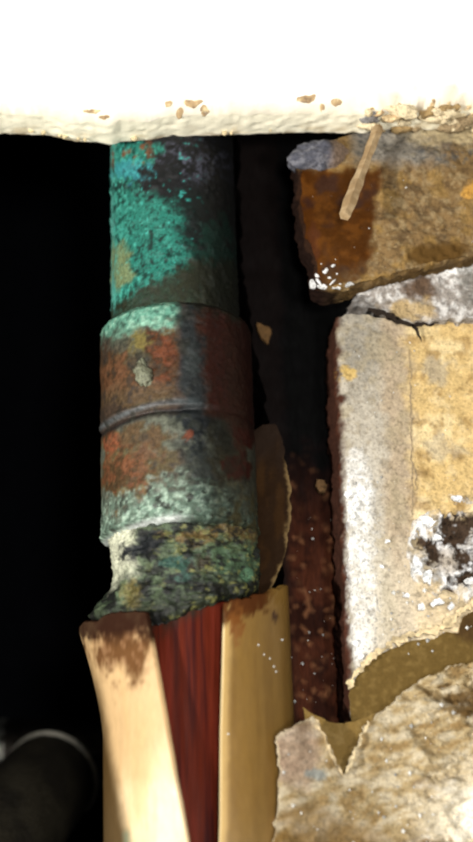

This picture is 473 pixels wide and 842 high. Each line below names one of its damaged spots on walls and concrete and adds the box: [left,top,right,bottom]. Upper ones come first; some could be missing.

crack [367,308,439,516]
peeling [302,494,473,775]